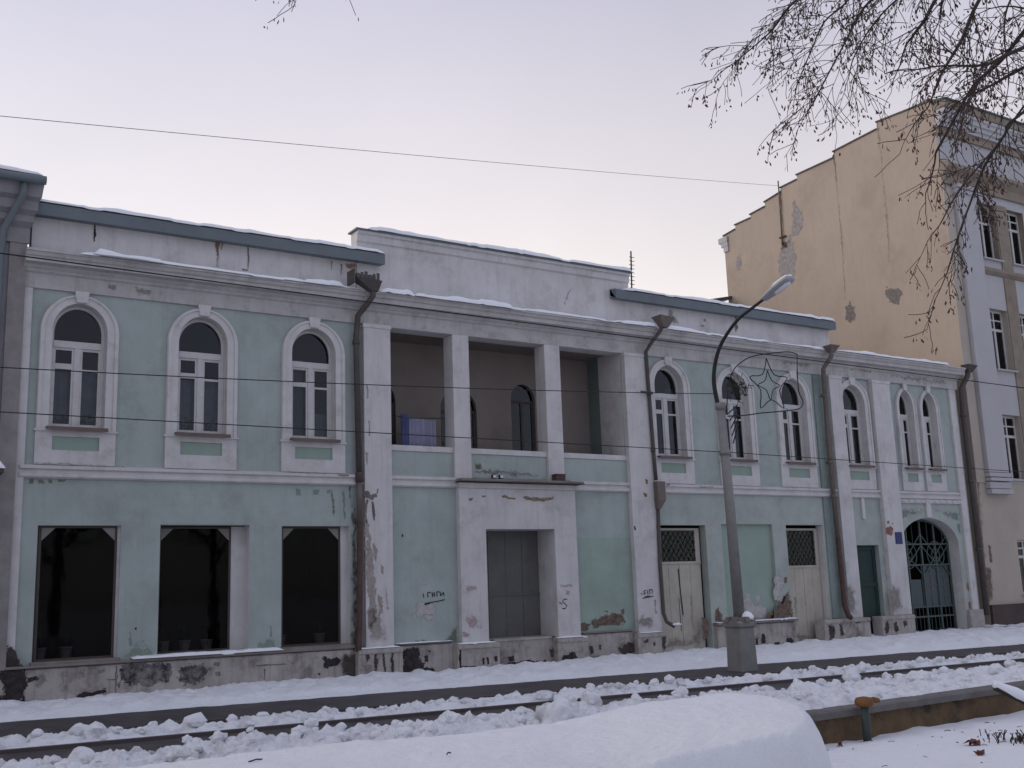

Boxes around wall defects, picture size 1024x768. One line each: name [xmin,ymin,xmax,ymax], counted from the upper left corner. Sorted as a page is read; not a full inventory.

peeling [778,200,803,276]
spalling [845,301,856,323]
spalling [885,286,903,305]
peeling [364,521,384,633]
peeling [743,574,793,619]
spalling [581,609,626,631]